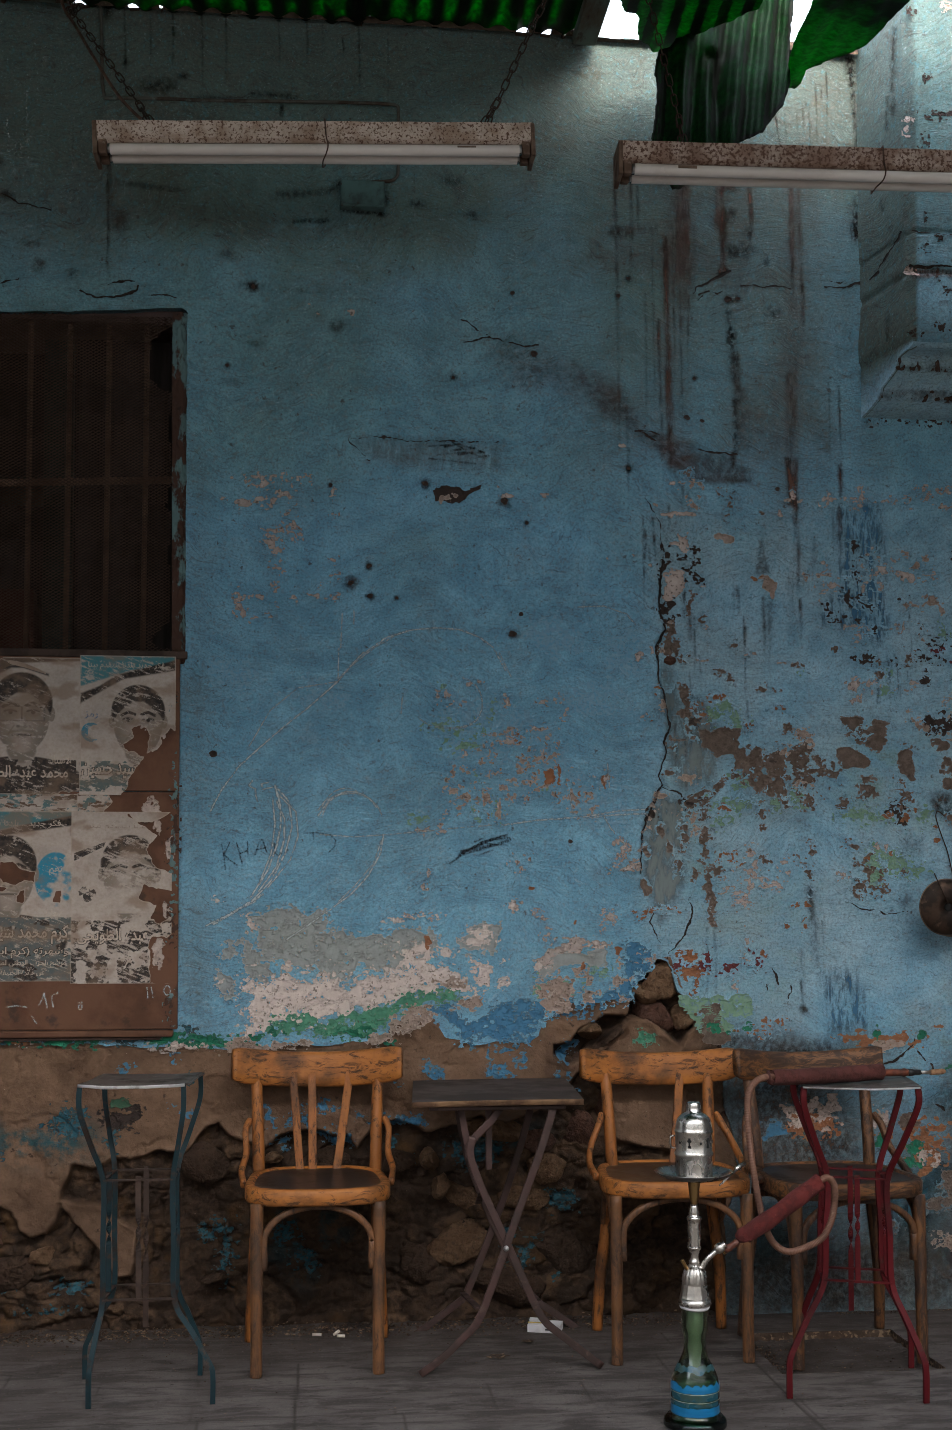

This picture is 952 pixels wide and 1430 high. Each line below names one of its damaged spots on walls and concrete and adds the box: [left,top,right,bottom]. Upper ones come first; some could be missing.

corrosion [715,186,752,274]
crack [693,230,952,301]
corrosion [651,185,691,469]
corrosion [786,458,797,519]
crack [638,492,686,874]
spalling [0,466,952,1333]
crack [649,895,693,959]